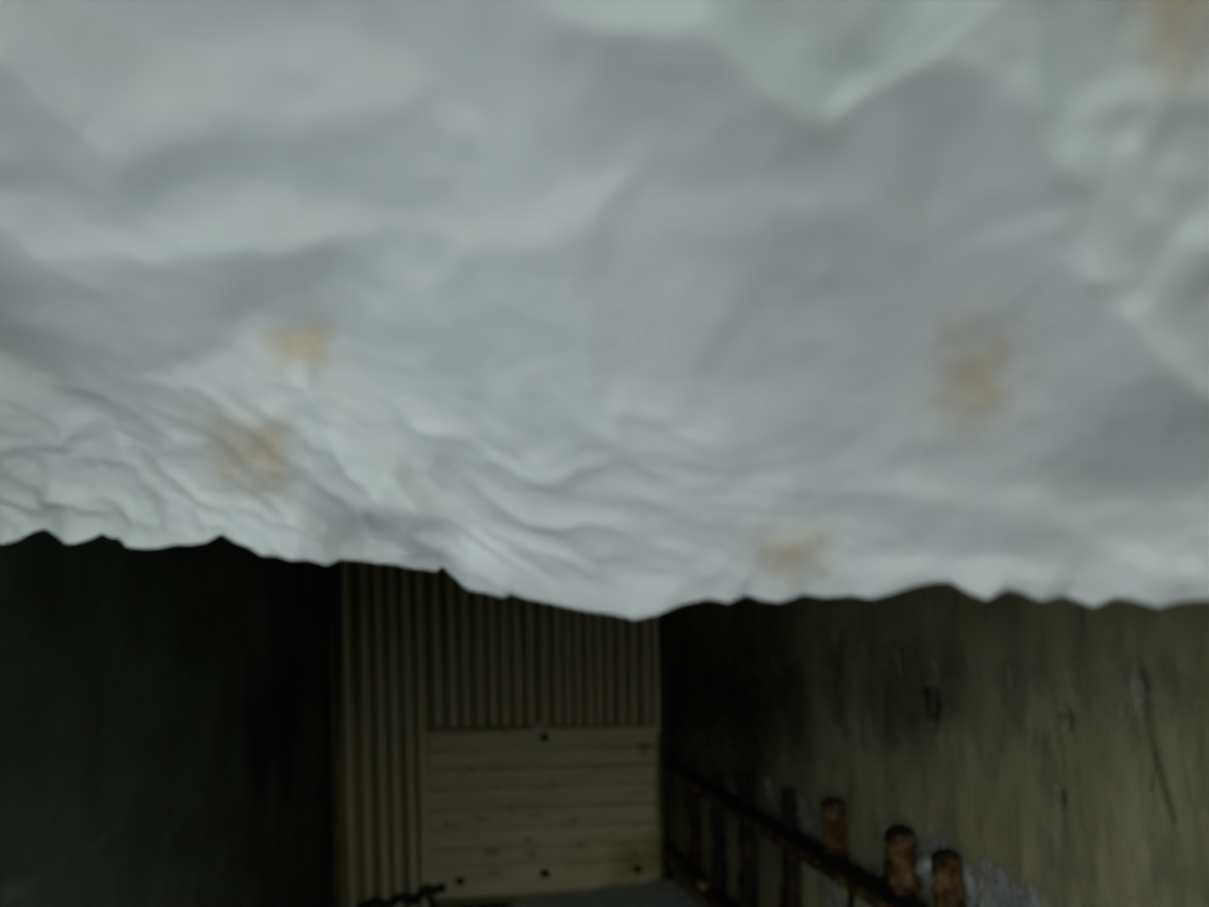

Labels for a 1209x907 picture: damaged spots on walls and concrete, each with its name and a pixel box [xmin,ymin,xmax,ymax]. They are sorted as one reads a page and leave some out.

efflorescence [915,827,1042,907]